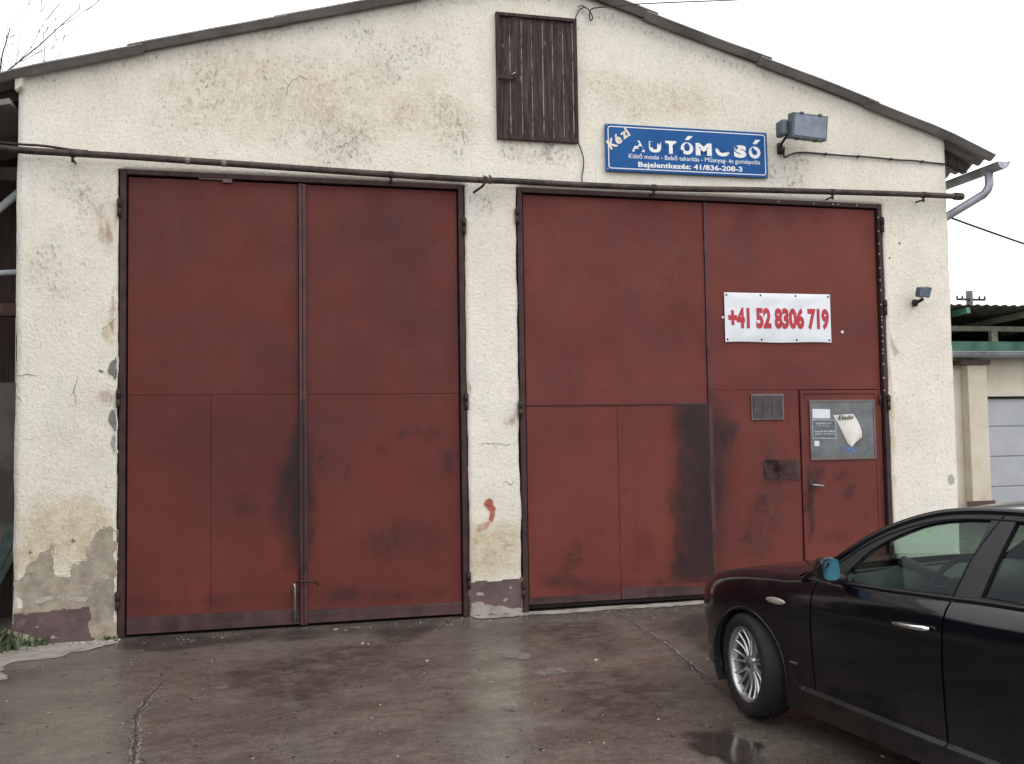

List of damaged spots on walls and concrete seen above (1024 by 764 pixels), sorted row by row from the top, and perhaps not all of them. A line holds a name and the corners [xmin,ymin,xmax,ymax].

spalling [99,356,119,381]
flaking render [13,526,118,644]
flaking render [470,586,522,616]
crack [129,680,170,764]